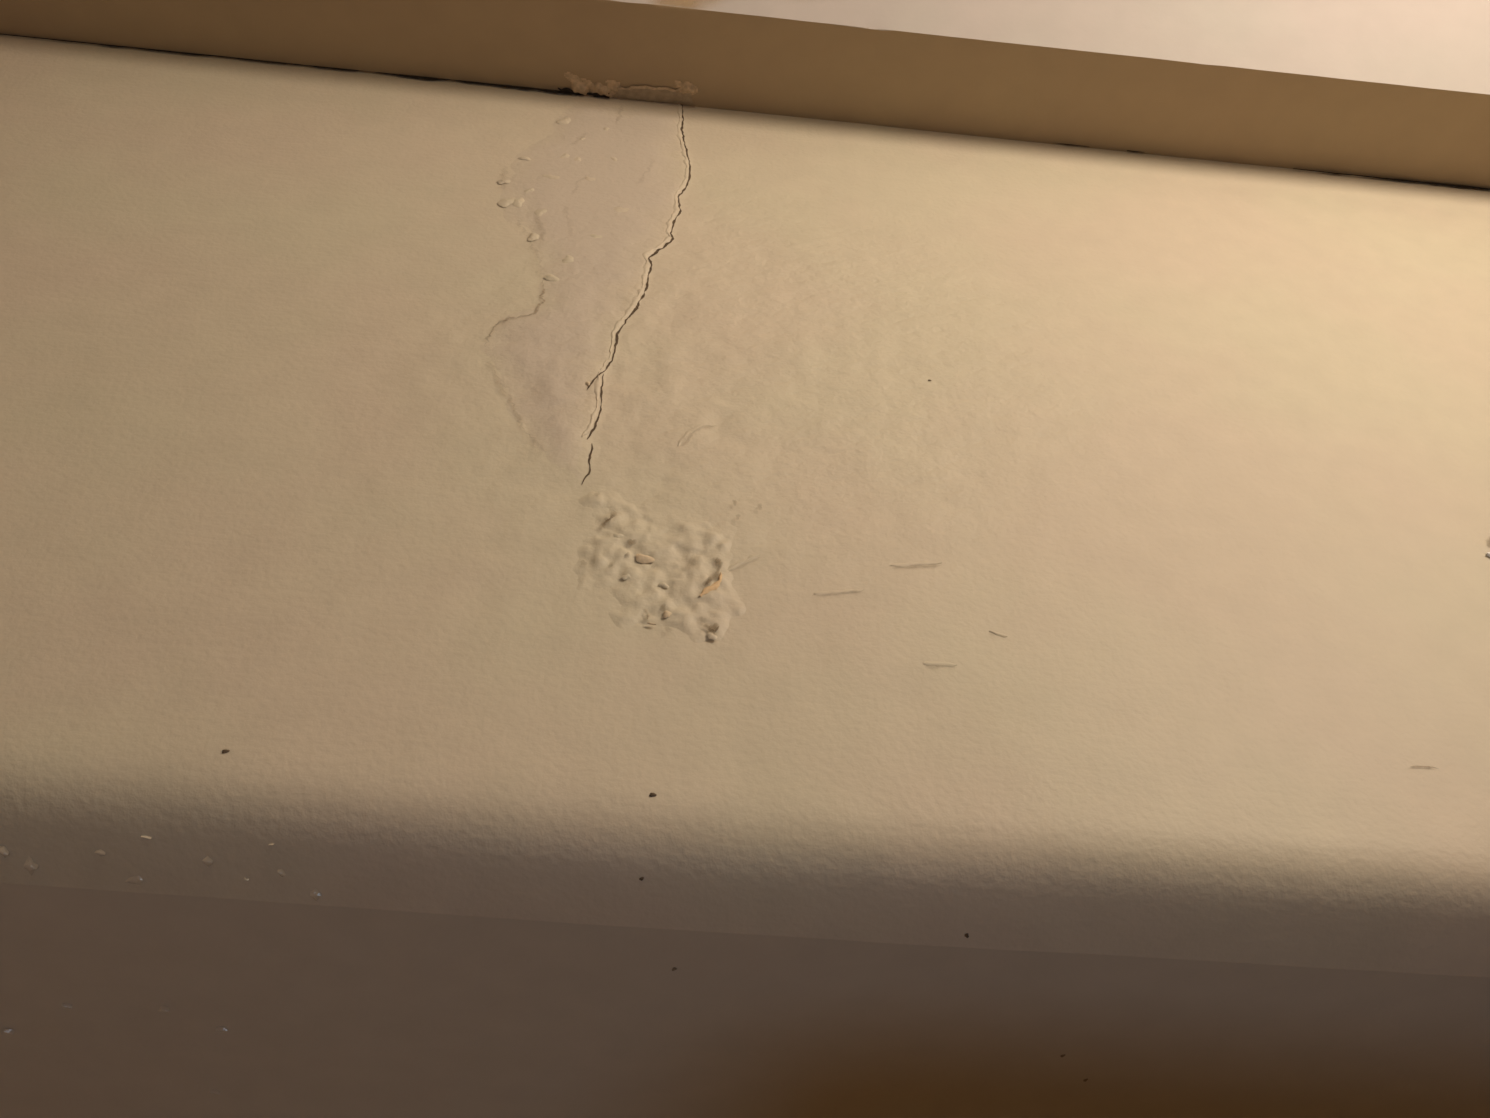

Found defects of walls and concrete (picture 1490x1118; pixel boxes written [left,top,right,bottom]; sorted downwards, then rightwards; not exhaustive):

crack [582,104,691,484]